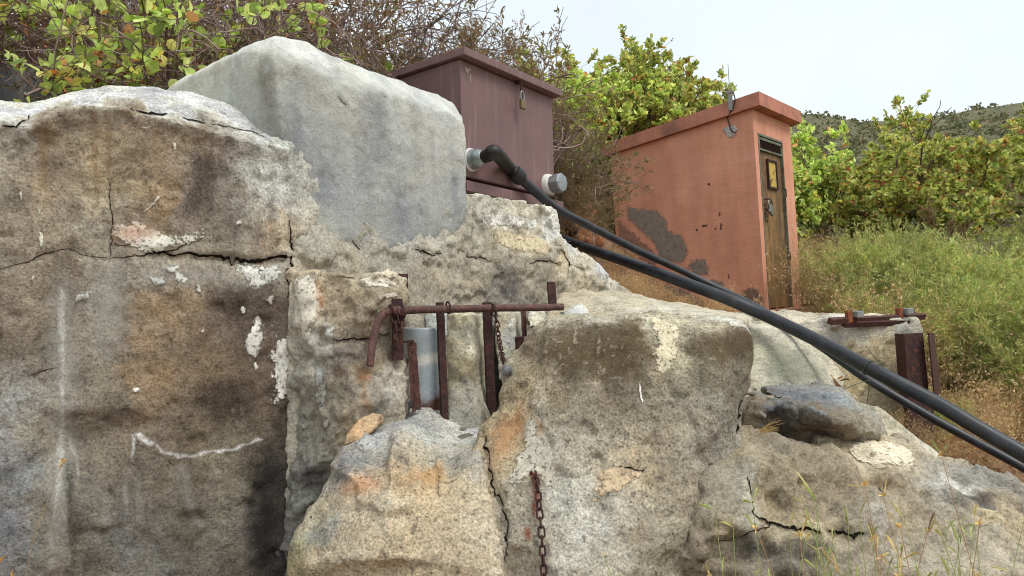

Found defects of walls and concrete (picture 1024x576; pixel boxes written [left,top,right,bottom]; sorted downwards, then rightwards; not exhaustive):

crack [130,108,264,137]
crack [5,183,294,309]
peeling [111,221,205,255]
peeling [616,206,729,286]
peeling [742,287,762,305]
peeling [240,275,335,404]
peeling [310,356,330,430]
crack [483,436,509,561]
crack [715,477,864,542]